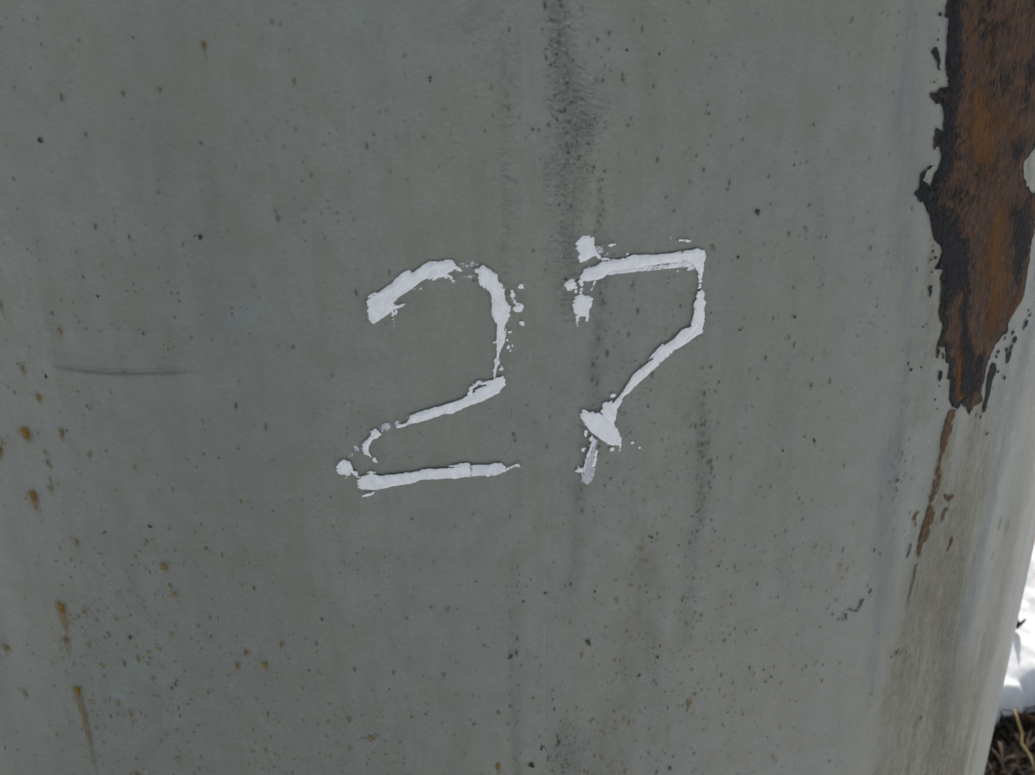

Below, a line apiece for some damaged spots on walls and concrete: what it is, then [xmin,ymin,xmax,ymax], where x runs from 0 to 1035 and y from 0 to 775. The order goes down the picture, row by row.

peeling [914,0,1035,418]
corrosion [907,410,957,608]